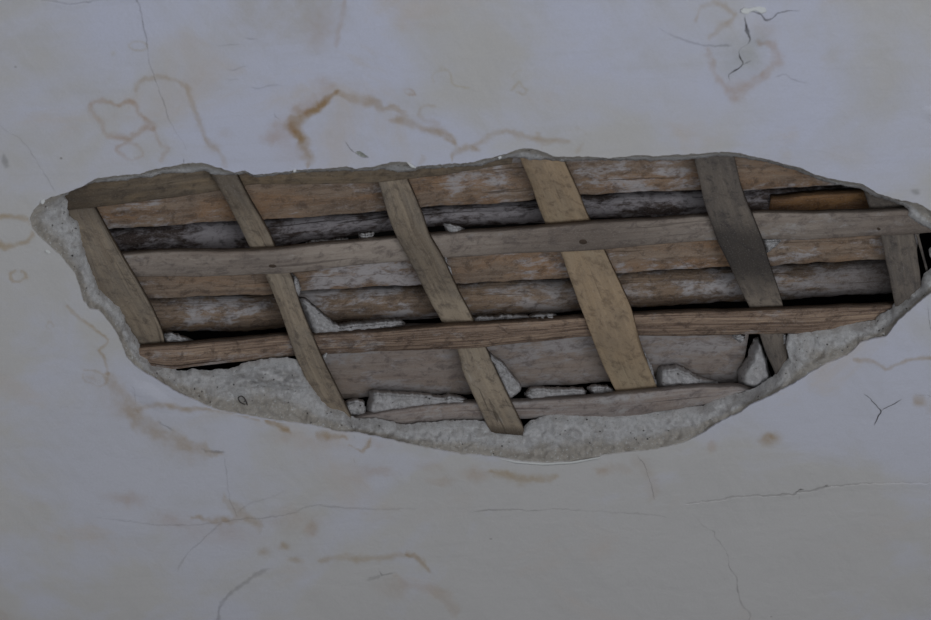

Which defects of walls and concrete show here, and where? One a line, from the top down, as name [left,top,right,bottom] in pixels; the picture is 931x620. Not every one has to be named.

flaking render [30,148,931,466]